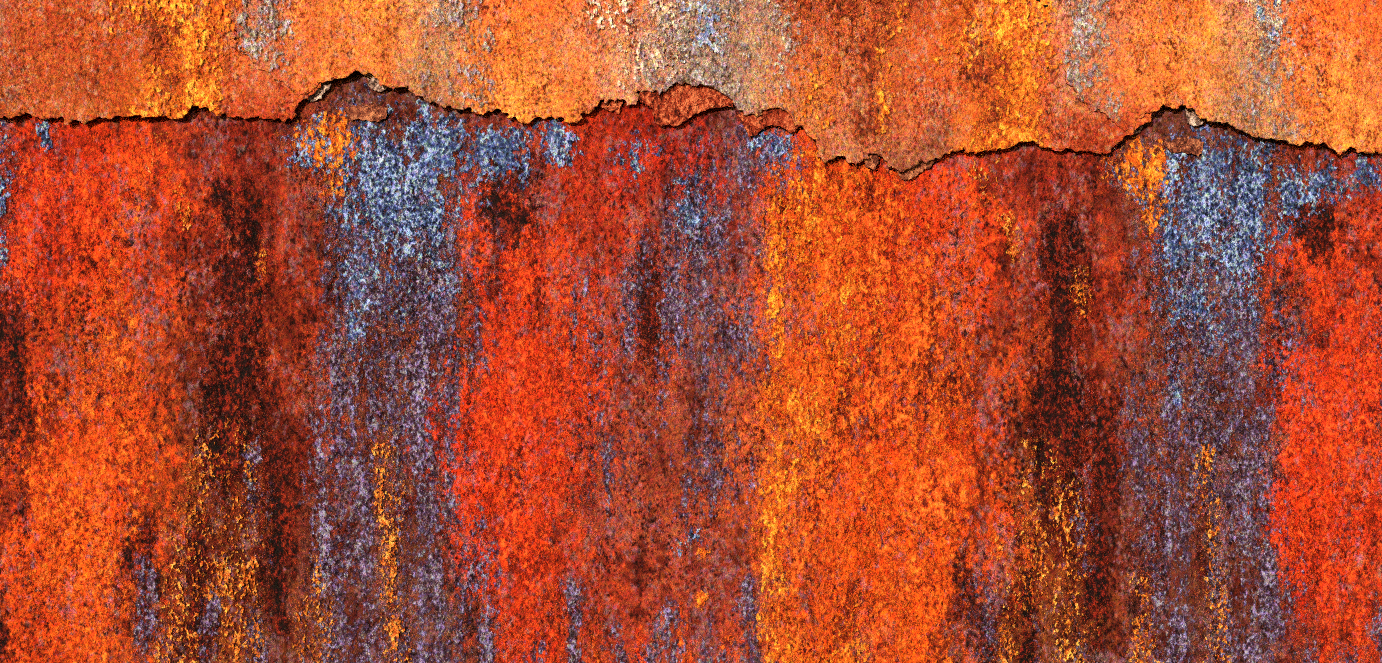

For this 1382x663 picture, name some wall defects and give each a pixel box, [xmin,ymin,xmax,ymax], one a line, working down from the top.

rust [293,104,388,202]
rust [967,161,997,207]
rust [997,206,1024,262]
rust [622,235,666,363]
rust [0,127,302,663]
rust [442,157,598,663]
rust [1263,191,1382,663]
rust [293,555,335,663]
rust [372,429,412,663]
rust [677,590,709,663]
rust [1129,572,1160,663]
rust [1193,444,1233,663]